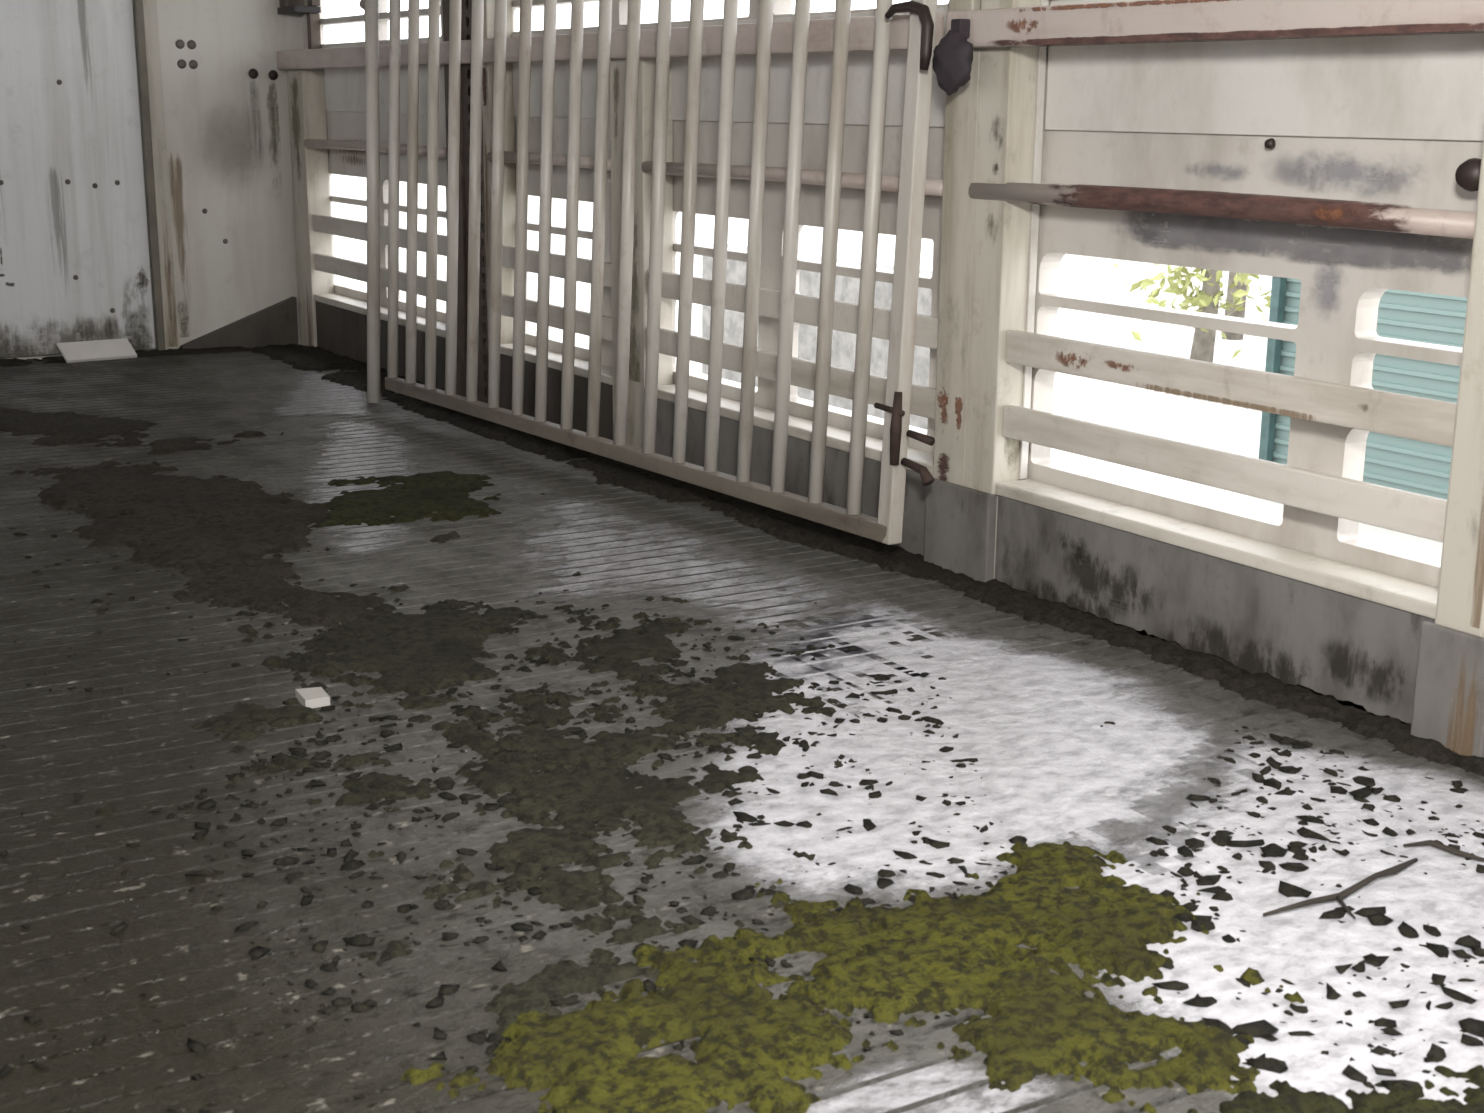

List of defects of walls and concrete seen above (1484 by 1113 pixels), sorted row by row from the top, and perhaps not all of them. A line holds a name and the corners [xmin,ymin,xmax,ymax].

corrosion [994,0,1484,47]
corrosion [1030,184,1408,233]
corrosion [938,389,962,429]
corrosion [938,454,949,481]